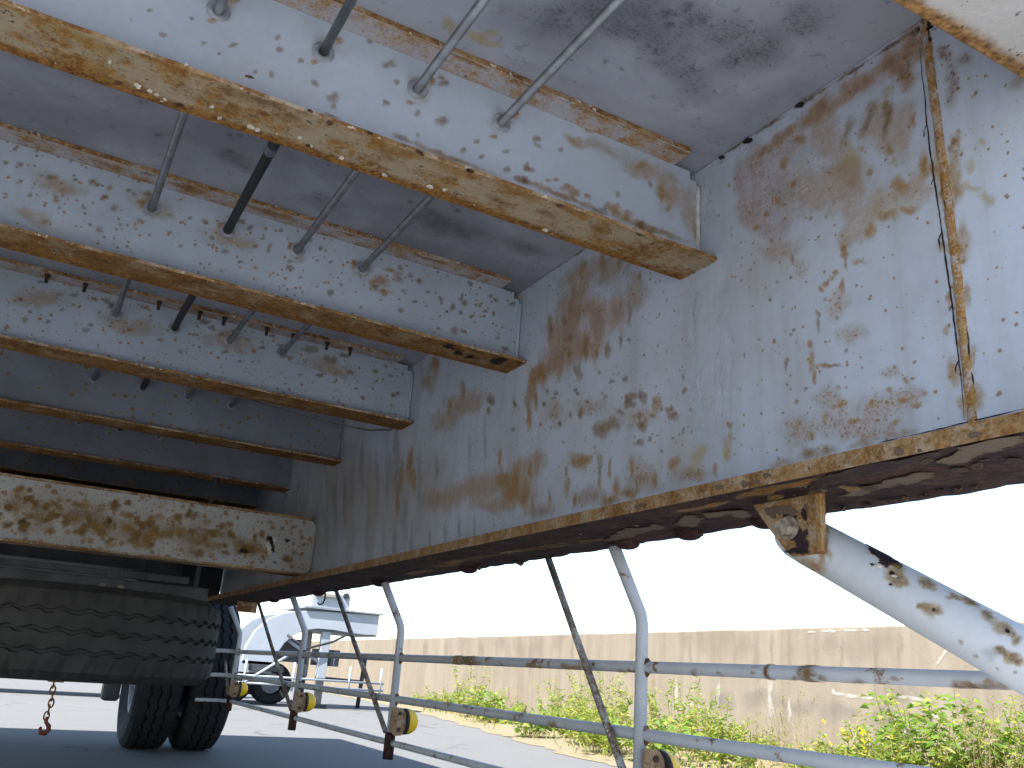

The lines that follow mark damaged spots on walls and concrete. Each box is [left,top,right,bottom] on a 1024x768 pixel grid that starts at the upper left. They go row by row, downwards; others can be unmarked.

rust [762,21,968,154]
rust [494,179,588,220]
crack [879,23,1020,443]
rust [780,371,925,441]
rust [0,486,292,562]
rust [565,456,656,505]
peeling [604,510,752,542]
peeling [765,504,807,519]
peeling [809,432,1024,511]